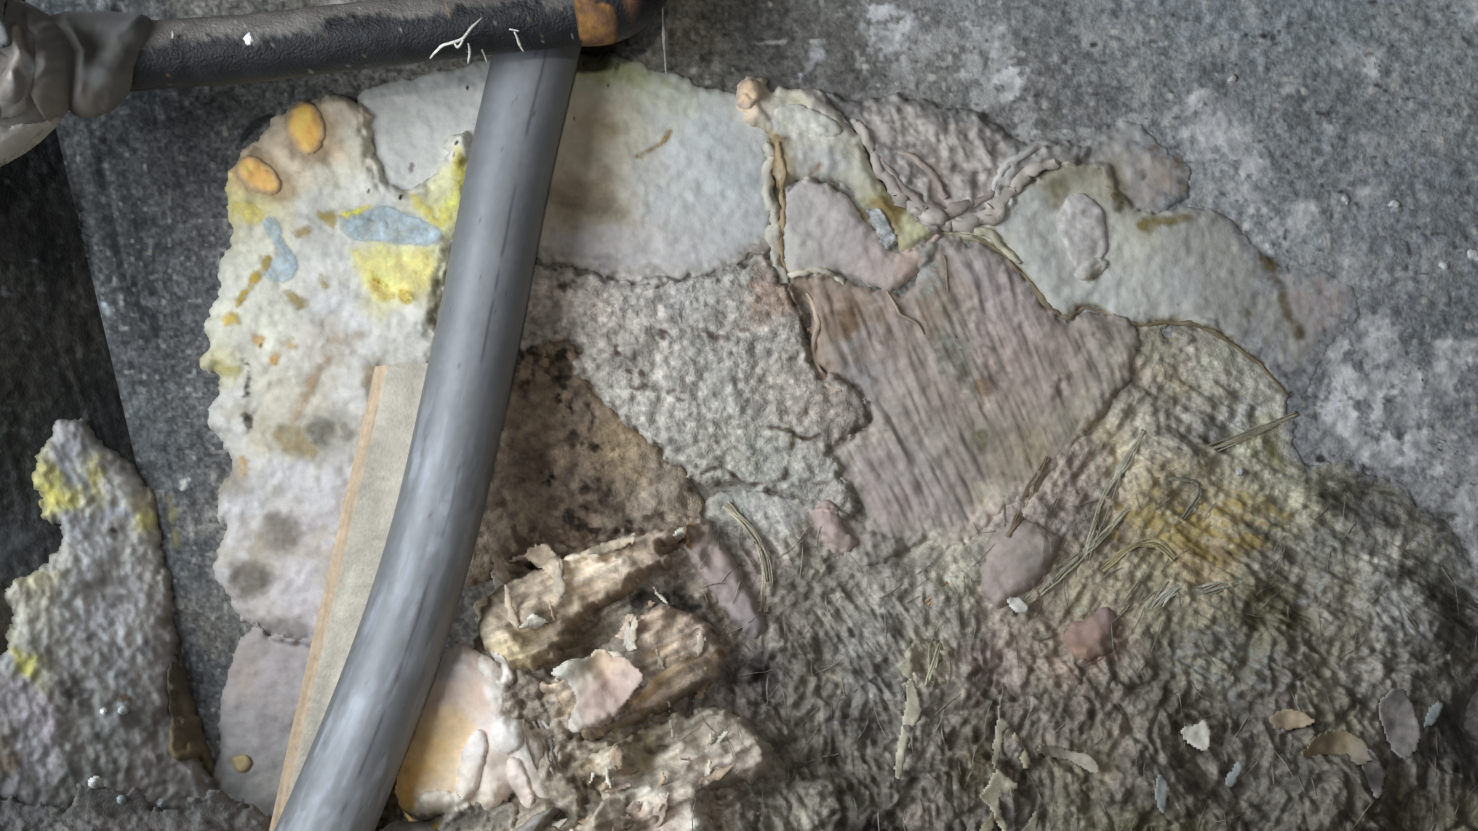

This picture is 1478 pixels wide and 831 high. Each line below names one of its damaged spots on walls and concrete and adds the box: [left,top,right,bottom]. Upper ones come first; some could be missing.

corrosion [574,0,640,46]
peeling [825,92,1086,250]
leakage [224,256,271,325]
leakage [353,248,434,304]
leakage [518,346,599,453]
flaking render [517,254,869,516]
leakage [1315,315,1478,613]
leakage [563,478,611,536]
peeling [524,544,566,600]
peeling [551,649,648,733]
peeling [979,697,1099,831]
peeling [1181,720,1211,751]